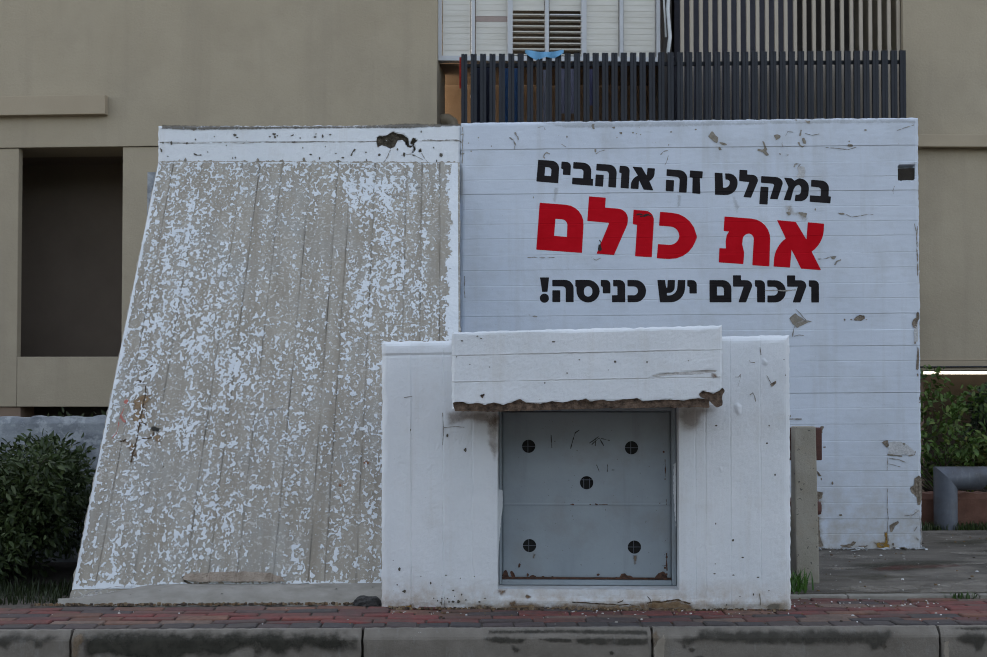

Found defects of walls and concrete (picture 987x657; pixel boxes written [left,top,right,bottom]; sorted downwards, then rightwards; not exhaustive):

peeling [789,310,811,337]
peeling [72,127,463,595]
spalling [653,360,717,377]
spalling [453,388,725,412]
spalling [818,476,928,551]
rust [499,590,692,610]
leakage [86,632,352,657]
leakage [683,630,890,657]